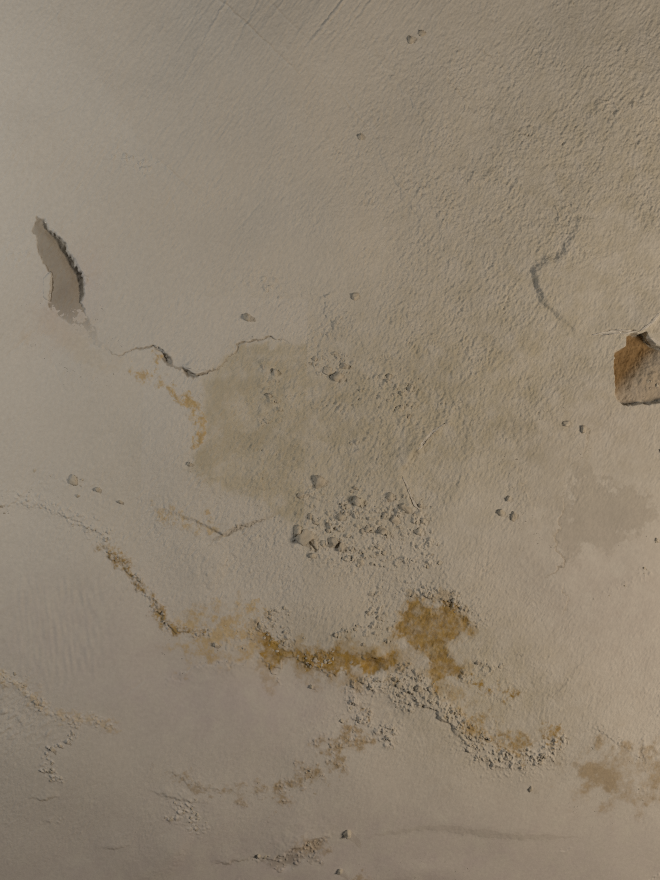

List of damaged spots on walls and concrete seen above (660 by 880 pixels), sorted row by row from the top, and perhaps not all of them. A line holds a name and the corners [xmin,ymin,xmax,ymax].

peeling [29,213,106,350]
crack [109,336,289,380]
spalling [612,330,660,407]
crack [207,513,281,547]
flaking render [186,327,522,690]
rust [92,540,569,768]
flaking render [336,661,569,775]
flaking render [211,835,334,873]